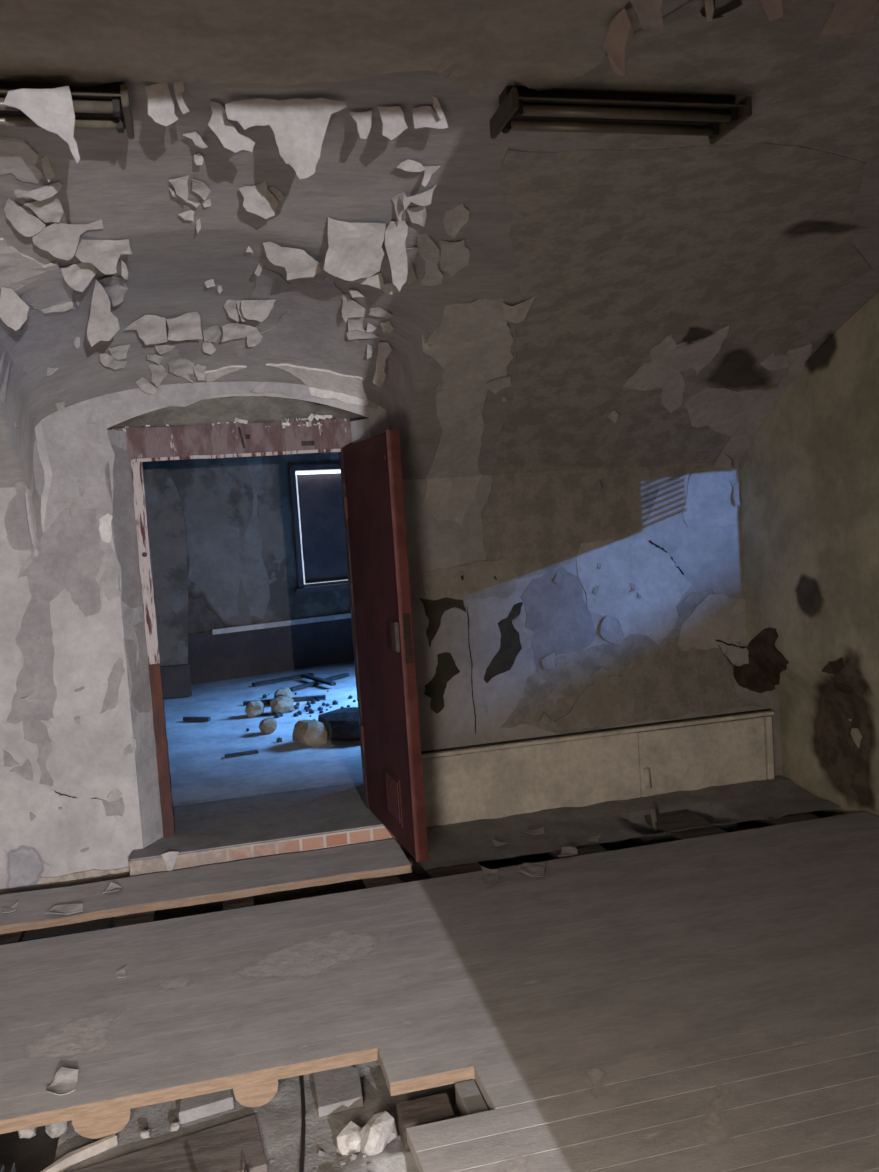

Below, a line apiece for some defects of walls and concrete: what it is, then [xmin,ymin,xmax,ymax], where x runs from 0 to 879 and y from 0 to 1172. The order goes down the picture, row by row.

peeling [0,0,879,808]
leakage [796,576,822,616]
peeling [102,787,124,817]